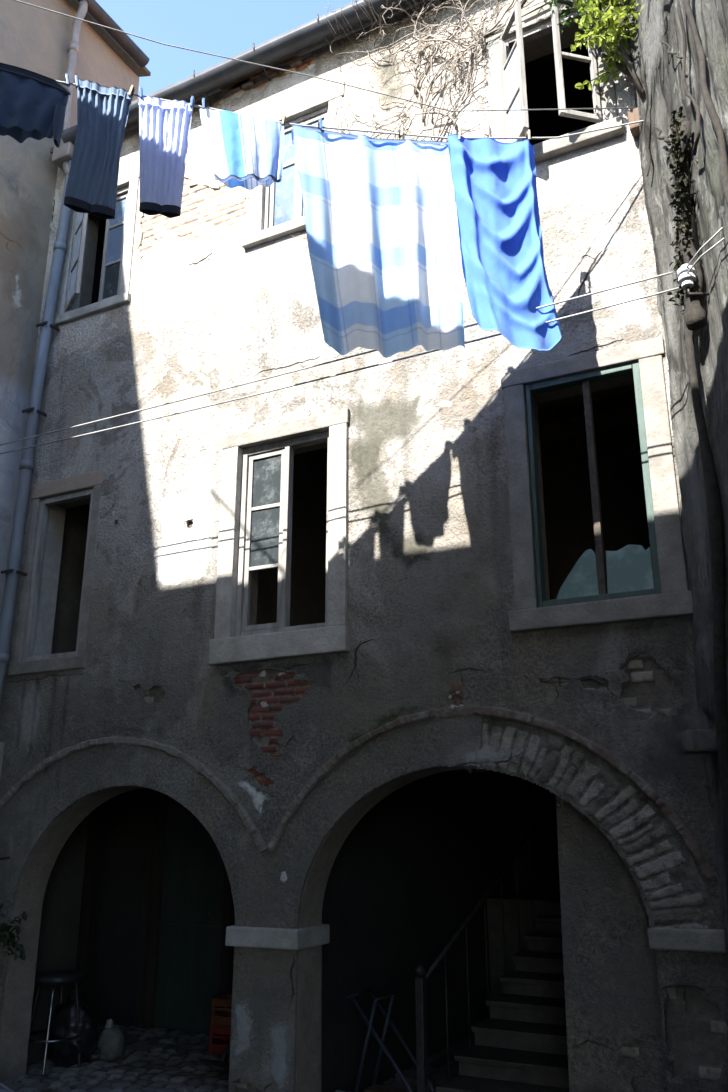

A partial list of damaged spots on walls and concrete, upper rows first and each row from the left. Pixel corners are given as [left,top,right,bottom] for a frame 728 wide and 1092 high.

flaking render [135,178,251,260]
crack [578,252,601,296]
damp [353,400,423,562]
crack [346,639,374,684]
flaking render [224,662,315,793]